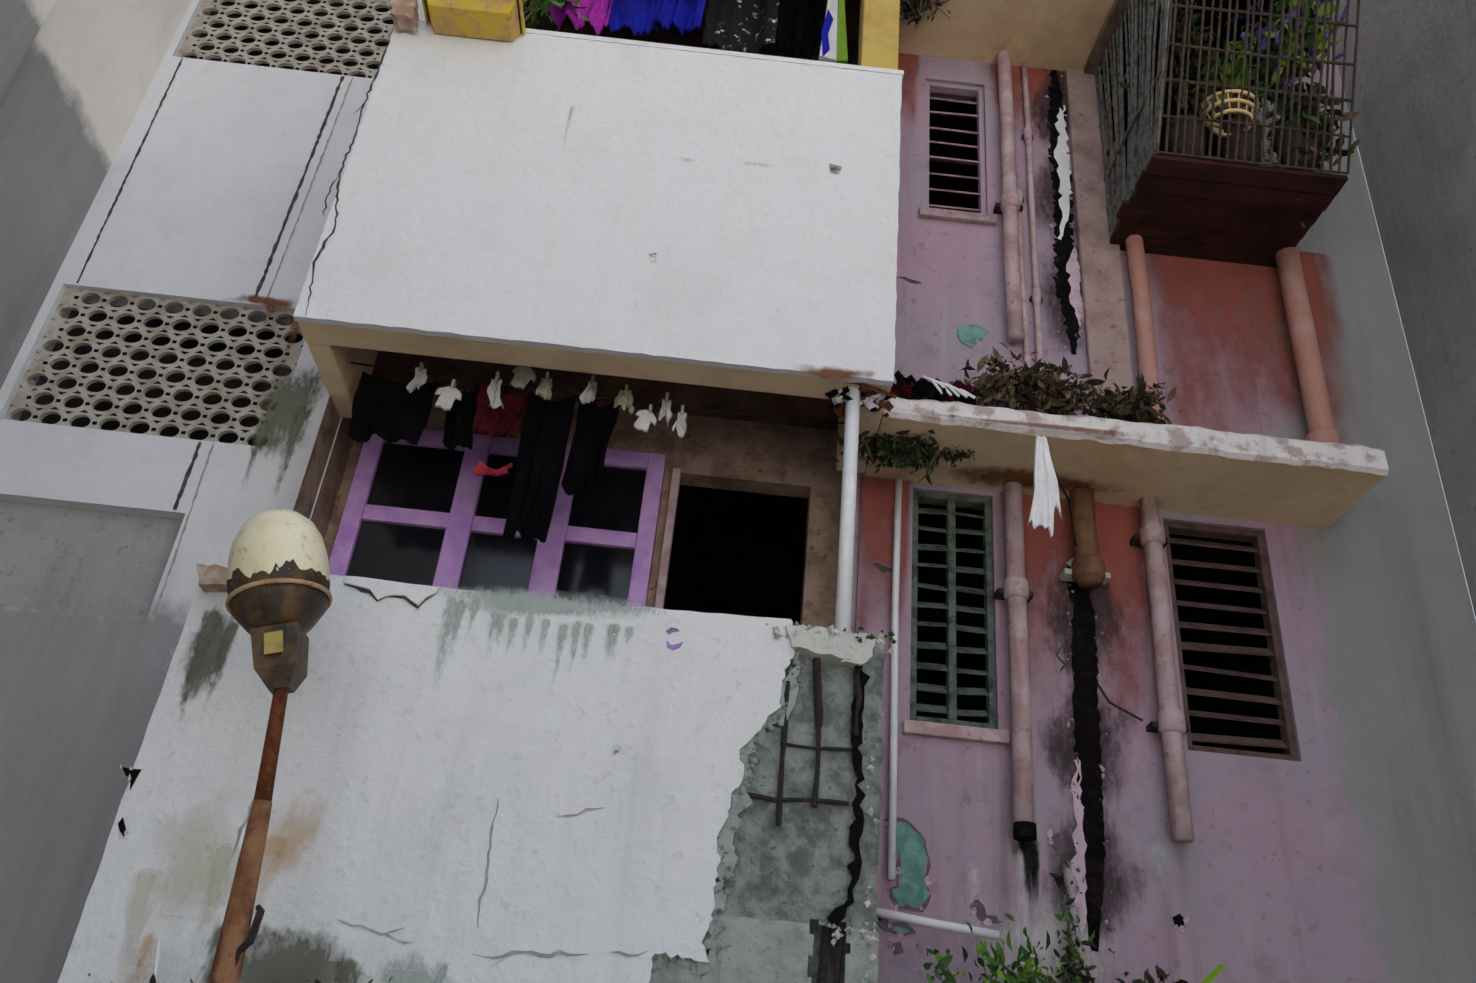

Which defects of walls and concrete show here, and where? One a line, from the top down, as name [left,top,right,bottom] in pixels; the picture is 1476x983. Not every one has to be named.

crack [306,25,394,312]
leakage [184,610,238,700]
leakage [441,589,646,653]
crack [472,798,647,967]
spalling [649,621,933,983]